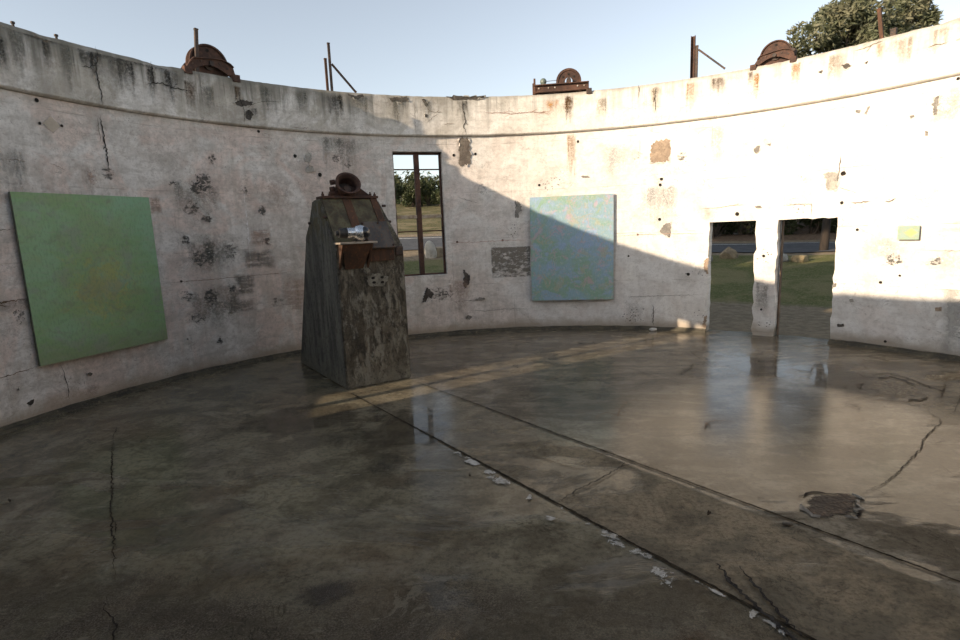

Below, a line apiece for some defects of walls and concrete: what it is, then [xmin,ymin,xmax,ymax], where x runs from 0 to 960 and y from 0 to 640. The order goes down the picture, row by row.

crack [84,49,109,169]
spalling [457,137,472,167]
spalling [637,138,687,164]
crack [855,372,960,495]
crack [103,427,118,640]
spalling [799,491,865,519]